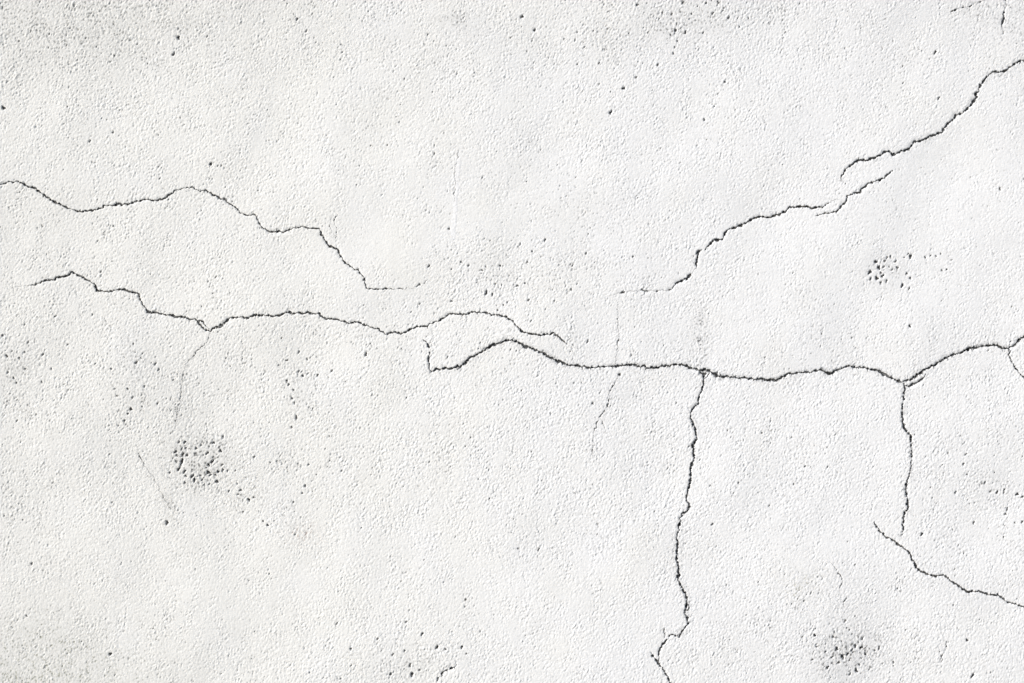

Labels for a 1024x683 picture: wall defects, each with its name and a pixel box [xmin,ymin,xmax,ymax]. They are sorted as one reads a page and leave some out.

crack [0,181,428,290]
crack [614,60,1024,295]
crack [18,271,1024,683]